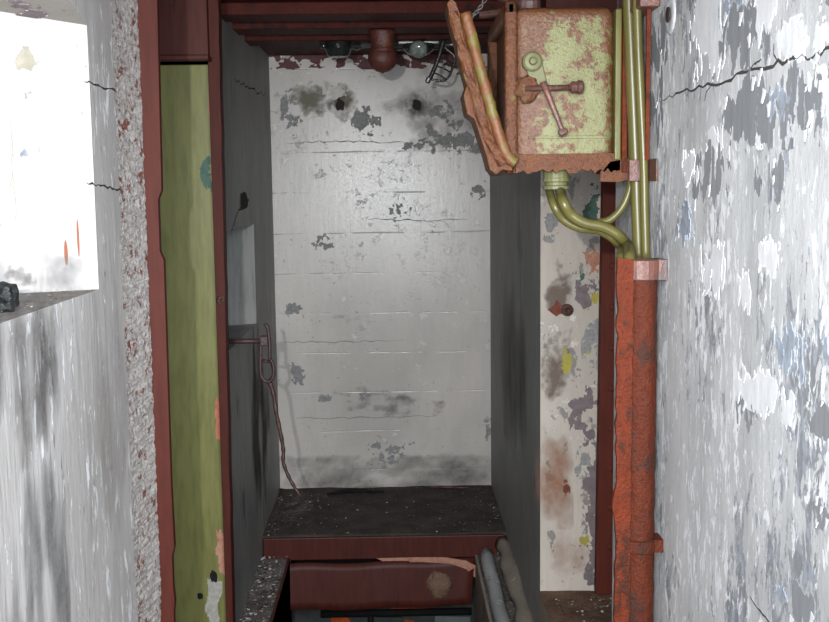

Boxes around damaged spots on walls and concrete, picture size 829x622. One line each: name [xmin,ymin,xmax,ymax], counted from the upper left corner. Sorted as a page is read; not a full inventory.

water stain [292,91,325,113]
peeling [269,55,373,72]
water stain [334,91,352,107]
peeling [650,0,676,148]
crack [662,44,829,101]
peeling [674,0,829,300]
flaking render [110,0,161,622]
peeling [737,234,782,316]
peeling [568,317,599,586]
peeling [735,319,808,434]
peeling [806,396,829,441]
peeling [197,529,225,622]